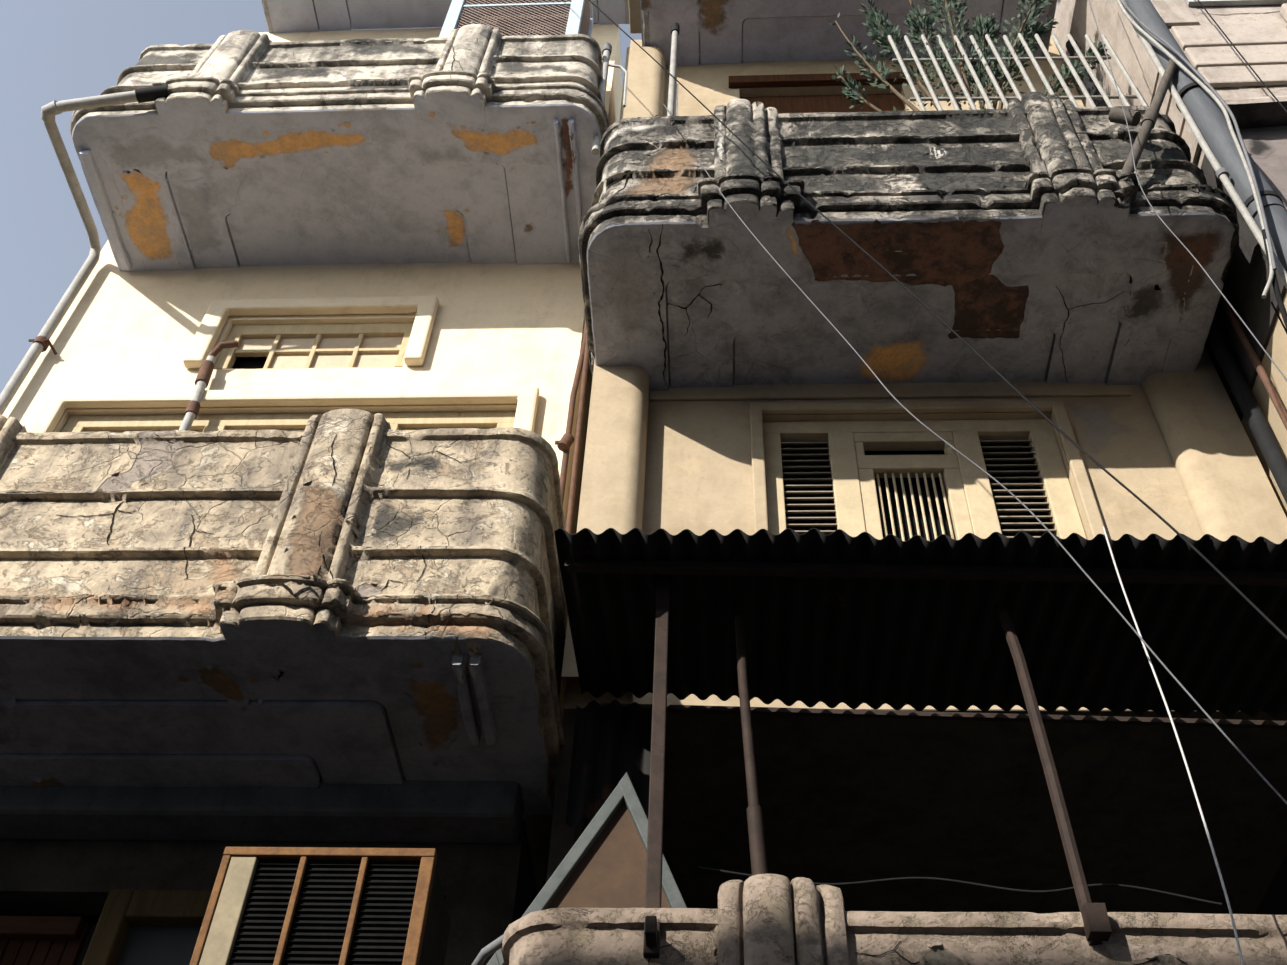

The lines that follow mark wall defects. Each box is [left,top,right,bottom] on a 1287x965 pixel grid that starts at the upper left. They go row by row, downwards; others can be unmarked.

peeling [691,0,734,39]
peeling [206,121,370,174]
peeling [427,111,541,171]
peeling [109,168,183,266]
peeling [434,207,471,262]
crack [603,126,723,384]
spalling [780,218,1034,384]
crack [60,501,135,545]
crack [1134,954,1188,965]